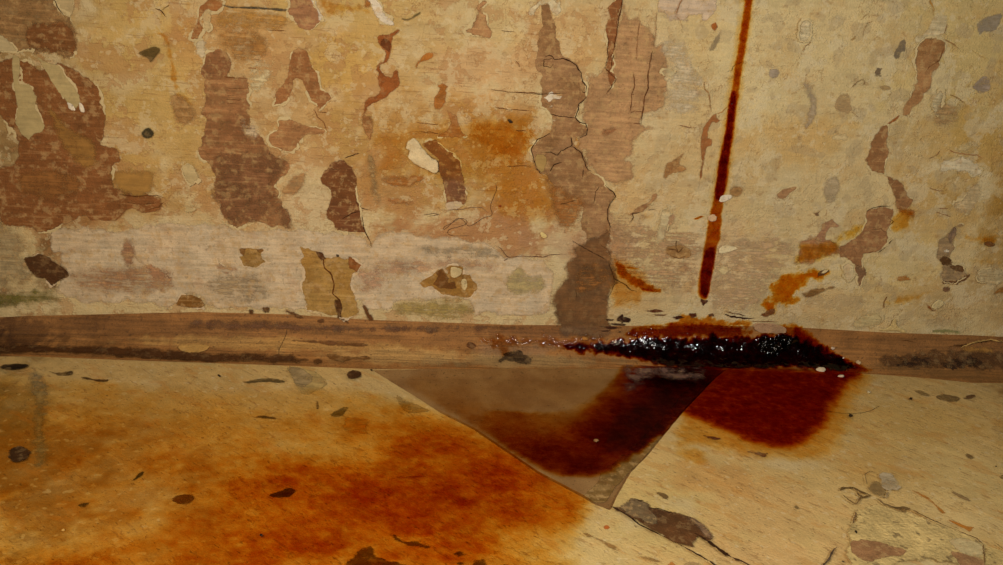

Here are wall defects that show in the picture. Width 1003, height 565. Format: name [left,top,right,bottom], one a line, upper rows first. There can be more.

peeling [0,0,162,234]
peeling [197,48,331,231]
peeling [320,153,372,247]
rust [499,350,533,364]
peeling [528,4,614,239]
crack [516,0,682,230]
rust [601,314,631,332]
rust [695,0,752,306]
rust [762,270,829,317]
peeling [798,16,947,287]
rust [169,365,861,565]
crack [611,506,750,565]